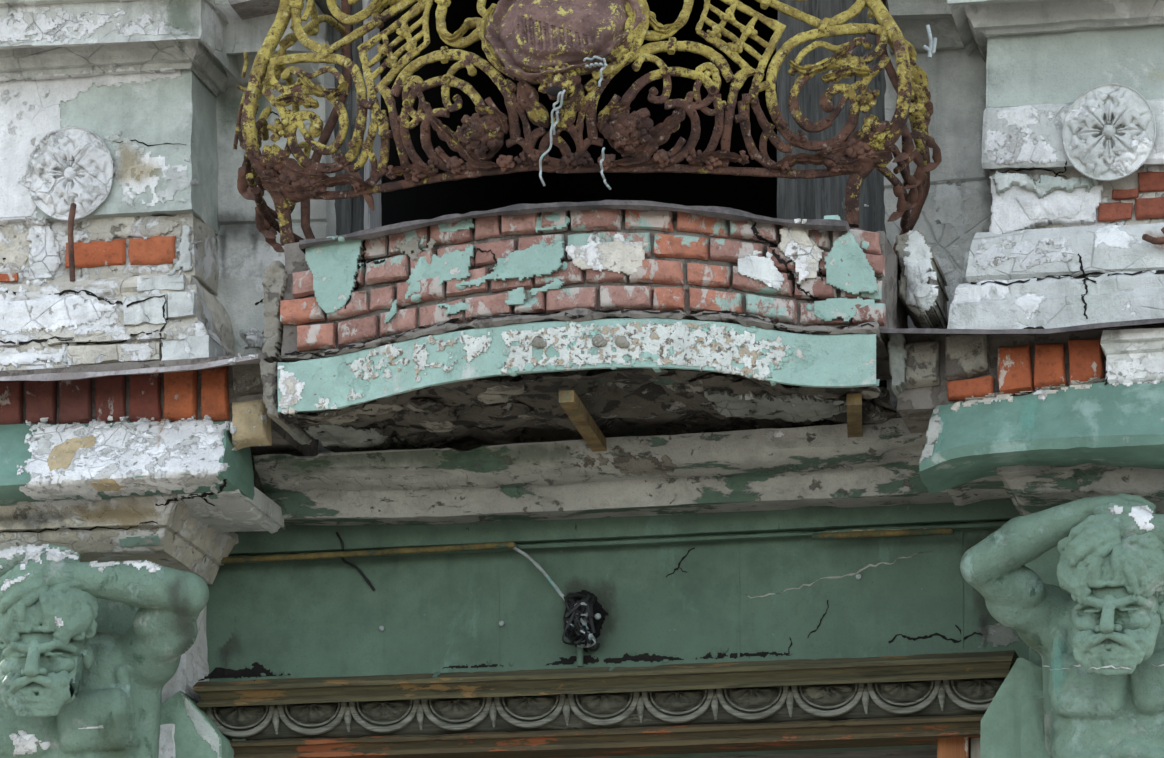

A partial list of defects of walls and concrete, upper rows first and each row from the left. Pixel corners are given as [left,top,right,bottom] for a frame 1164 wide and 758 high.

flaking render [983,126,1098,199]
flaking render [0,63,203,368]
flaking render [305,235,364,314]
flaking render [384,213,650,324]
flaking render [738,215,878,323]
spalling [895,230,949,329]
crack [971,253,1164,319]
peeling [228,260,847,456]
peeling [17,415,237,504]
peeling [0,544,161,591]
crack [666,548,695,577]
crack [746,550,933,654]